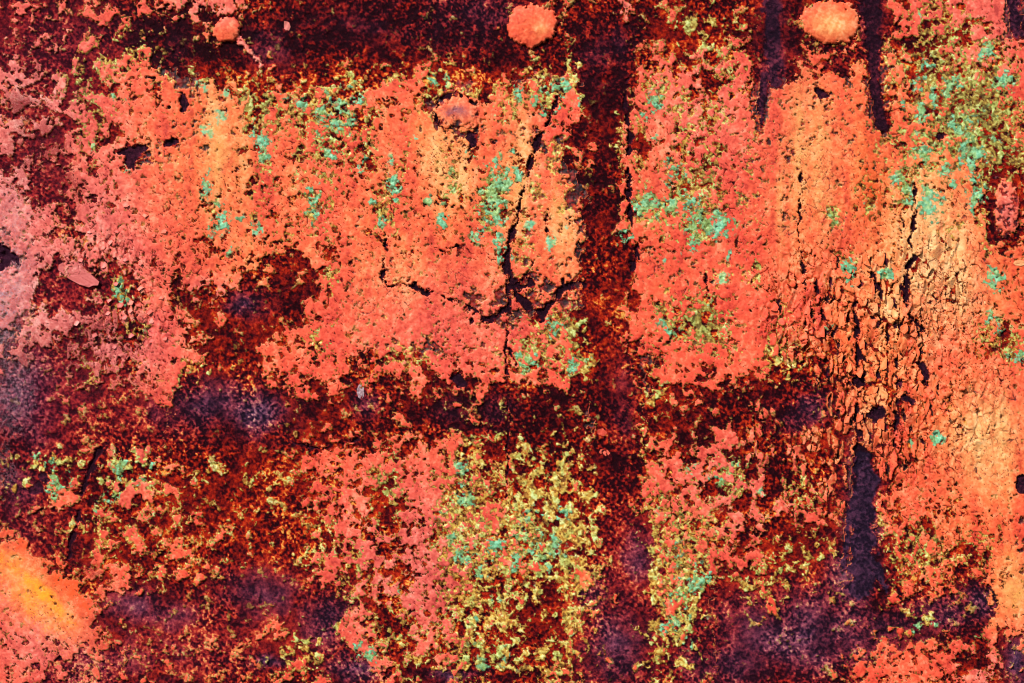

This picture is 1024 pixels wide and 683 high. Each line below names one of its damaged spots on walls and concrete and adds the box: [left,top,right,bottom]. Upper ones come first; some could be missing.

peeling [70,68,540,269]
rust [504,131,530,249]
peeling [473,75,582,130]
rust [775,100,835,251]
crack [379,89,591,499]
peeling [632,0,1024,582]
crack [797,167,926,454]
rust [0,628,32,660]
rust [5,660,46,683]
peeling [0,452,196,601]
peeling [317,446,610,683]
peeling [645,460,718,683]